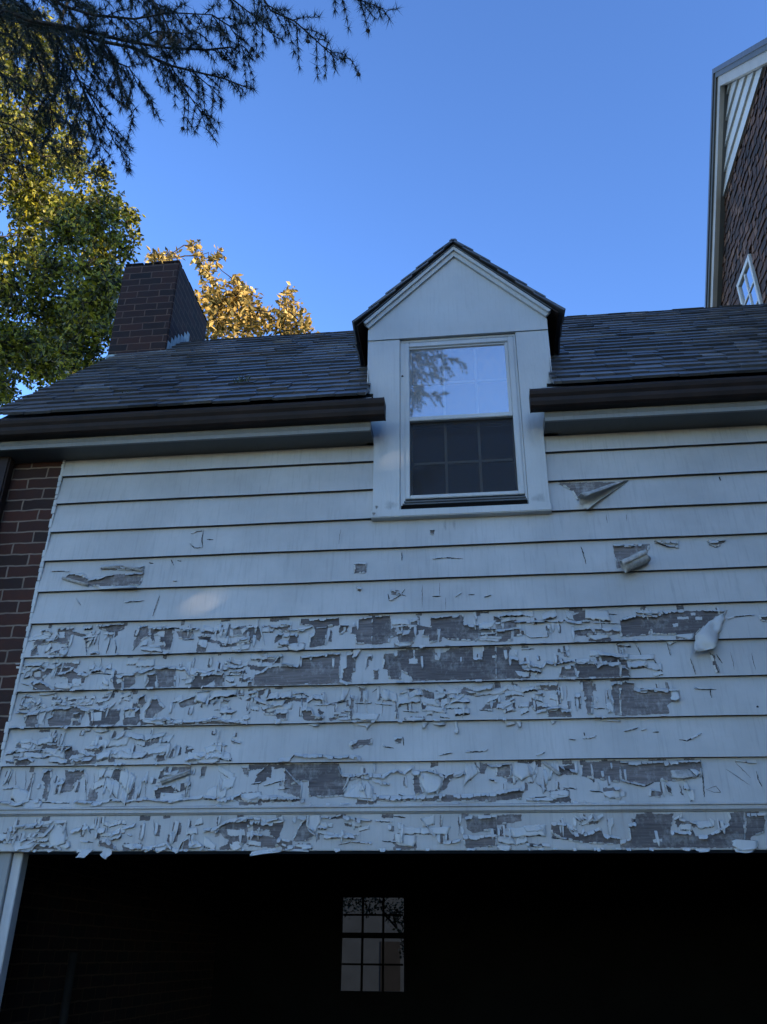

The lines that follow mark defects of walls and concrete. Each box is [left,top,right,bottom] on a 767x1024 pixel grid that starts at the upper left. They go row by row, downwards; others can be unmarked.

peeling [557,479,629,509]
peeling [613,540,679,573]
peeling [52,565,145,589]
peeling [0,605,767,859]